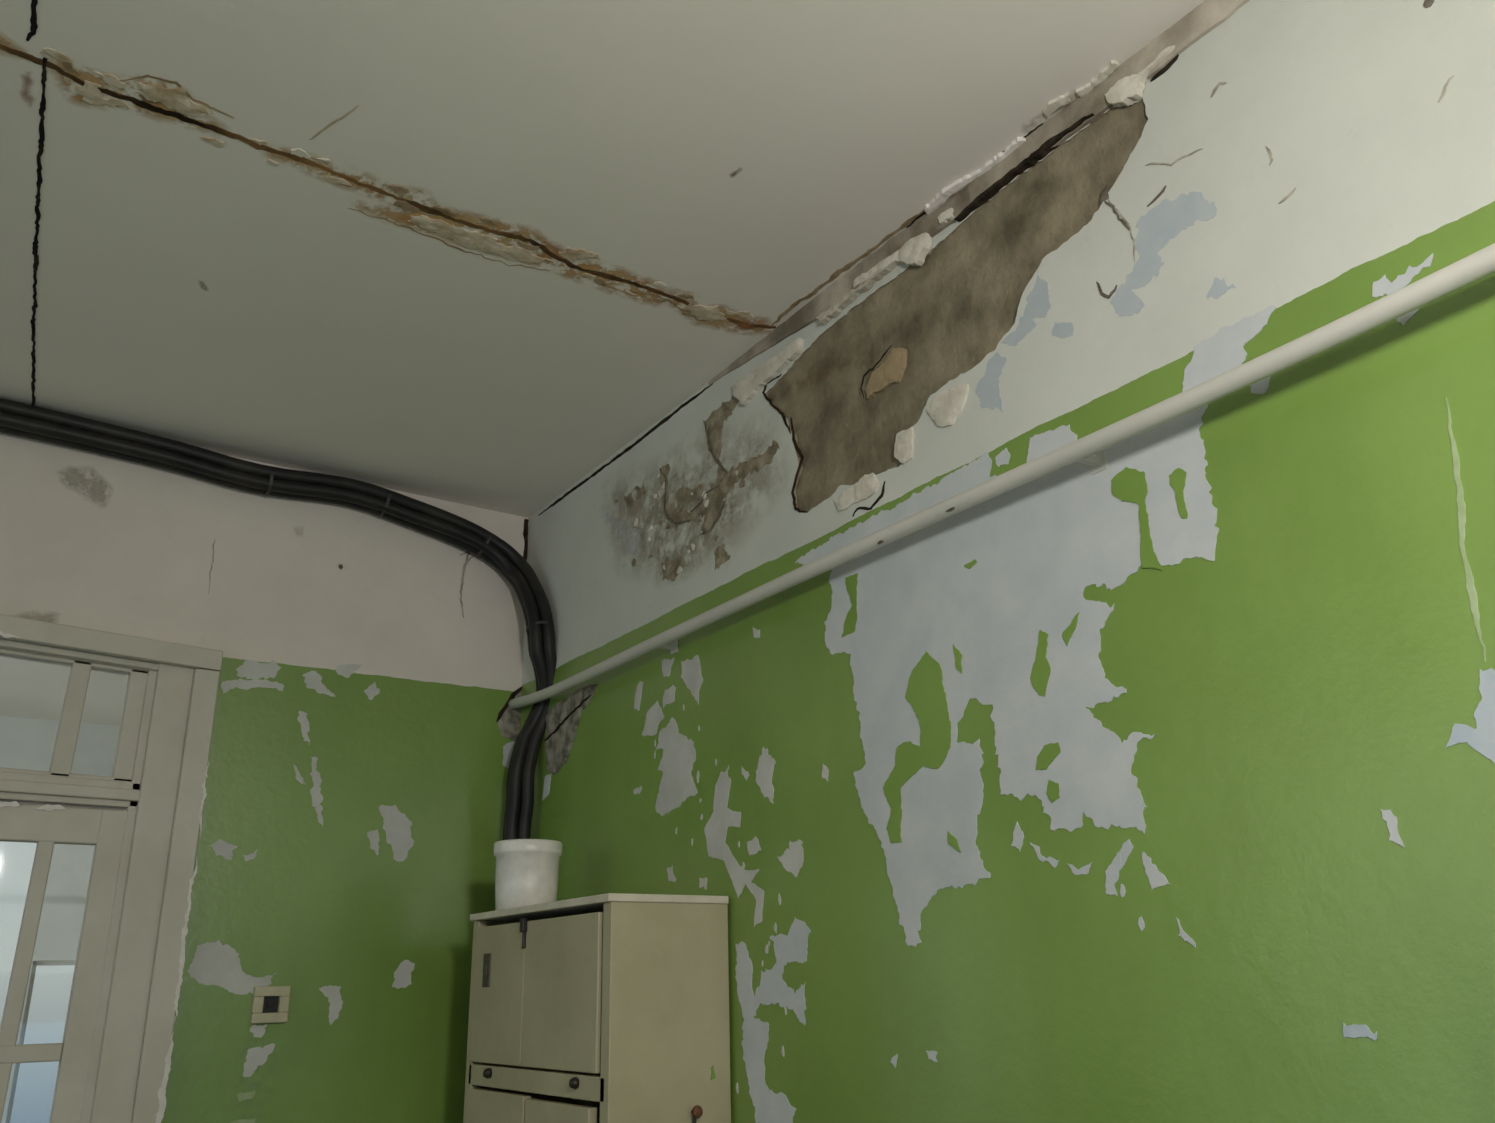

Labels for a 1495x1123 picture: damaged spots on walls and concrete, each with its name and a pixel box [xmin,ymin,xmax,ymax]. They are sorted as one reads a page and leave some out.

crack [0,0,776,405]
peeling [1182,305,1276,394]
peeling [614,45,1219,947]
peeling [221,660,284,693]
peeling [302,664,363,697]
peeling [364,682,380,700]
peeling [1446,668,1495,763]
peeling [294,711,323,825]
peeling [367,805,415,862]
peeling [633,655,811,1123]
peeling [156,762,276,1123]